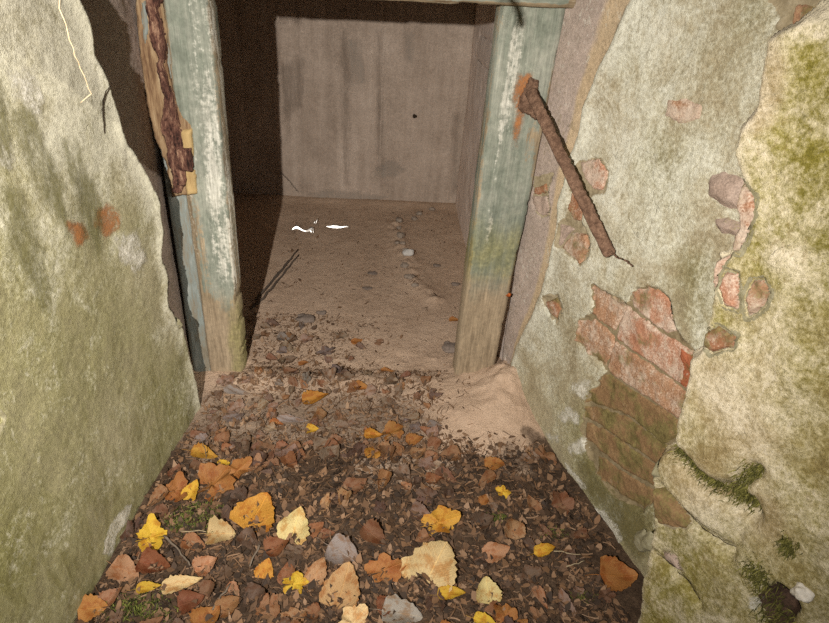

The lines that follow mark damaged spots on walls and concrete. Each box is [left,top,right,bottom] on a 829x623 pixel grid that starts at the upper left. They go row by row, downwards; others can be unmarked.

spalling [768,0,821,31]
spalling [554,189,590,267]
rust [514,74,633,267]
spalling [575,158,609,198]
spalling [708,172,774,322]
spalling [574,283,741,530]